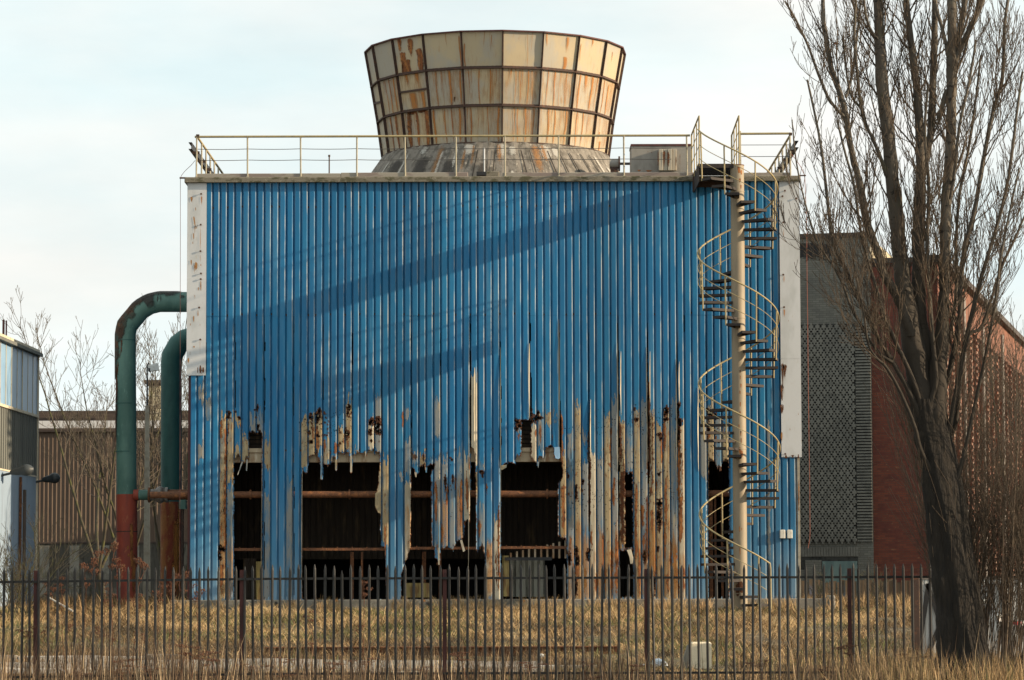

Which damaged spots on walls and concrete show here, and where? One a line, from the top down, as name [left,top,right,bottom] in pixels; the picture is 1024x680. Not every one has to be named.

corrosion [383,33,614,172]
corrosion [220,411,249,594]
peeling [286,374,500,599]
peeling [518,404,558,463]
corrosion [503,381,685,597]